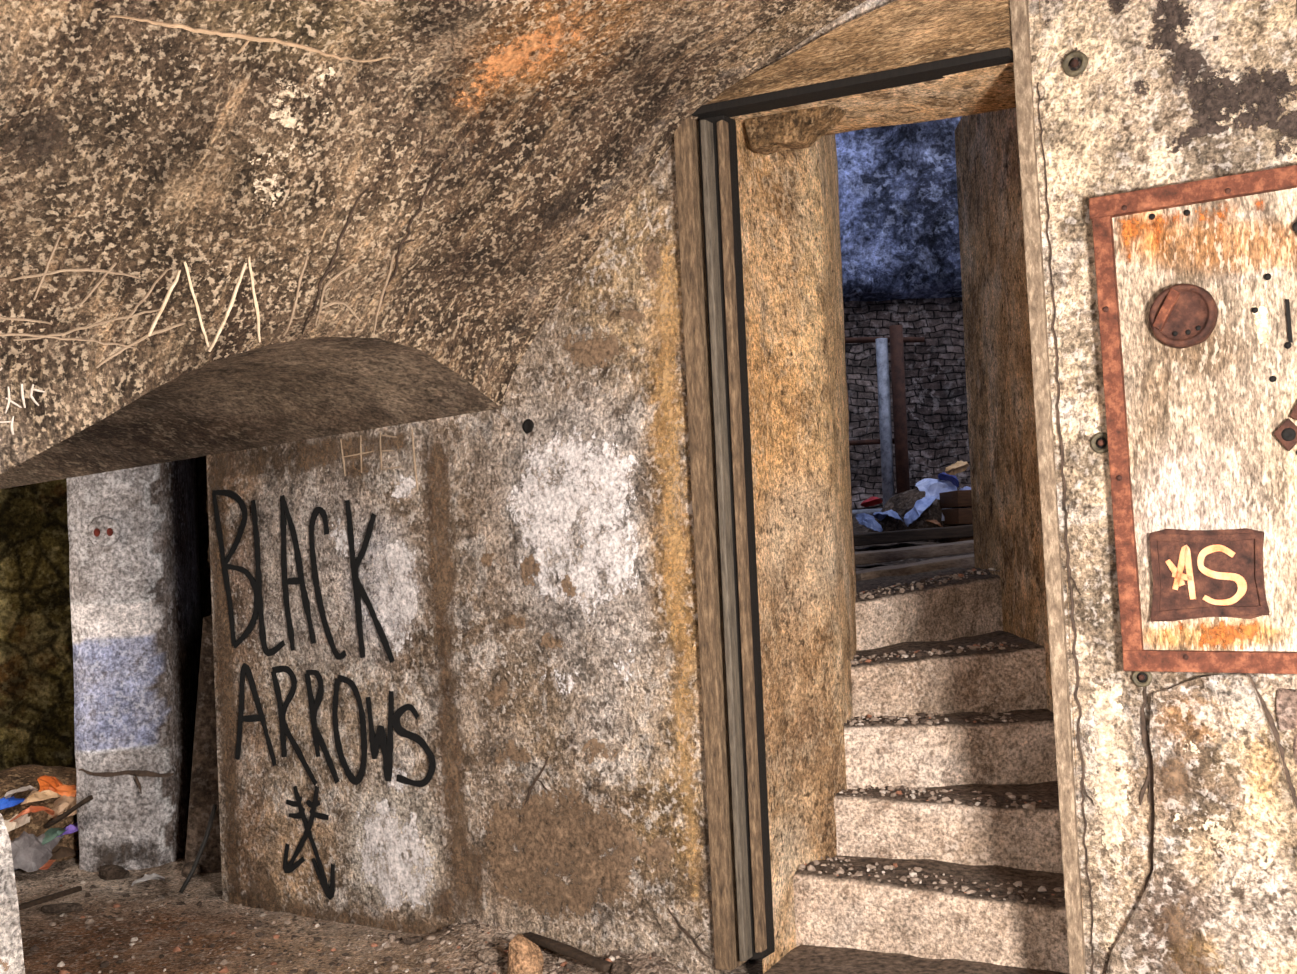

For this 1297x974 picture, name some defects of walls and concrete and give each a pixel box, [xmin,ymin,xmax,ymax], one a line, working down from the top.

corrosion [1119,202,1238,262]
corrosion [1198,621,1258,651]
peeling [1088,681,1131,881]
peeling [1103,673,1297,974]
crack [1246,673,1297,806]